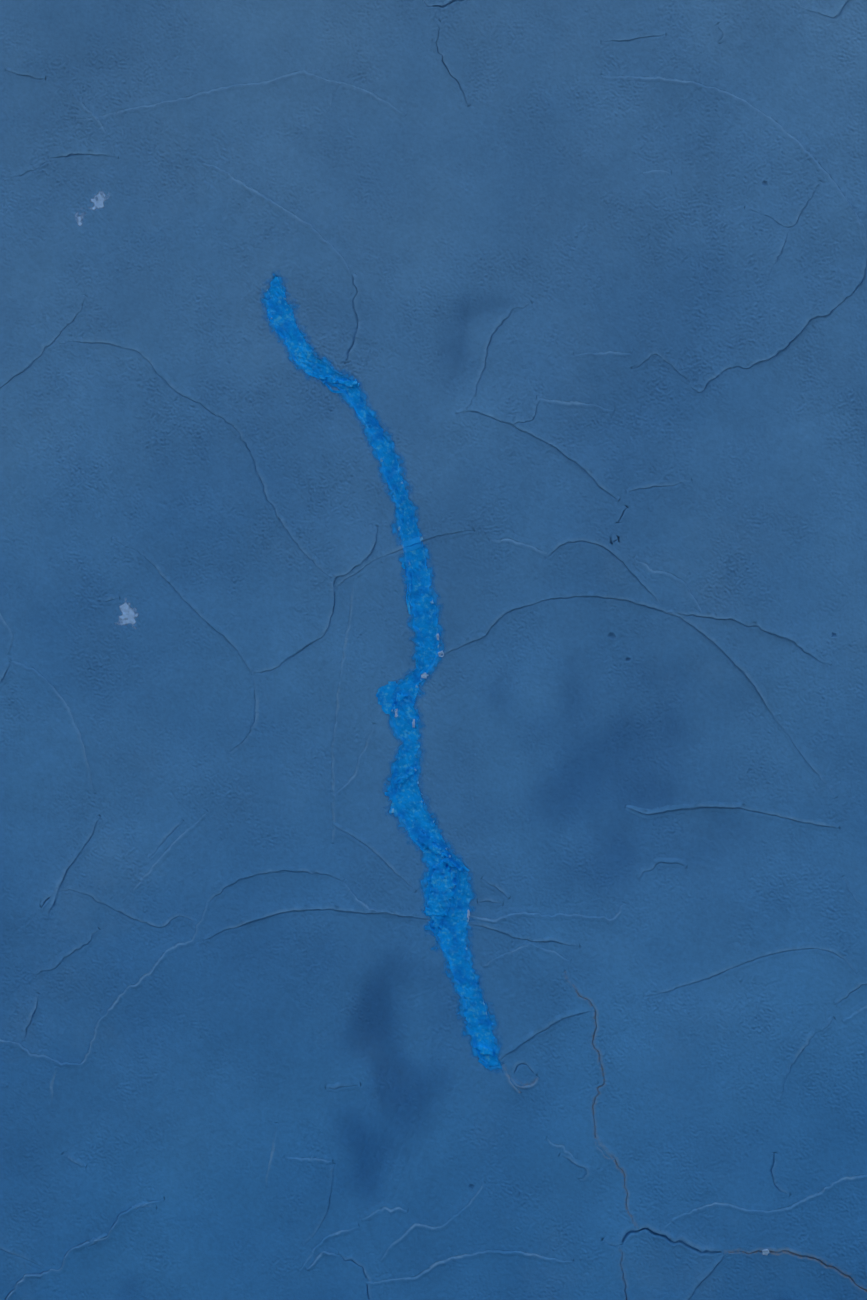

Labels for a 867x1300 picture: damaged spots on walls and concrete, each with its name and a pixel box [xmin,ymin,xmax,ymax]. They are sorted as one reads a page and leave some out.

crack [417,0,471,107]
crack [261,274,867,1300]